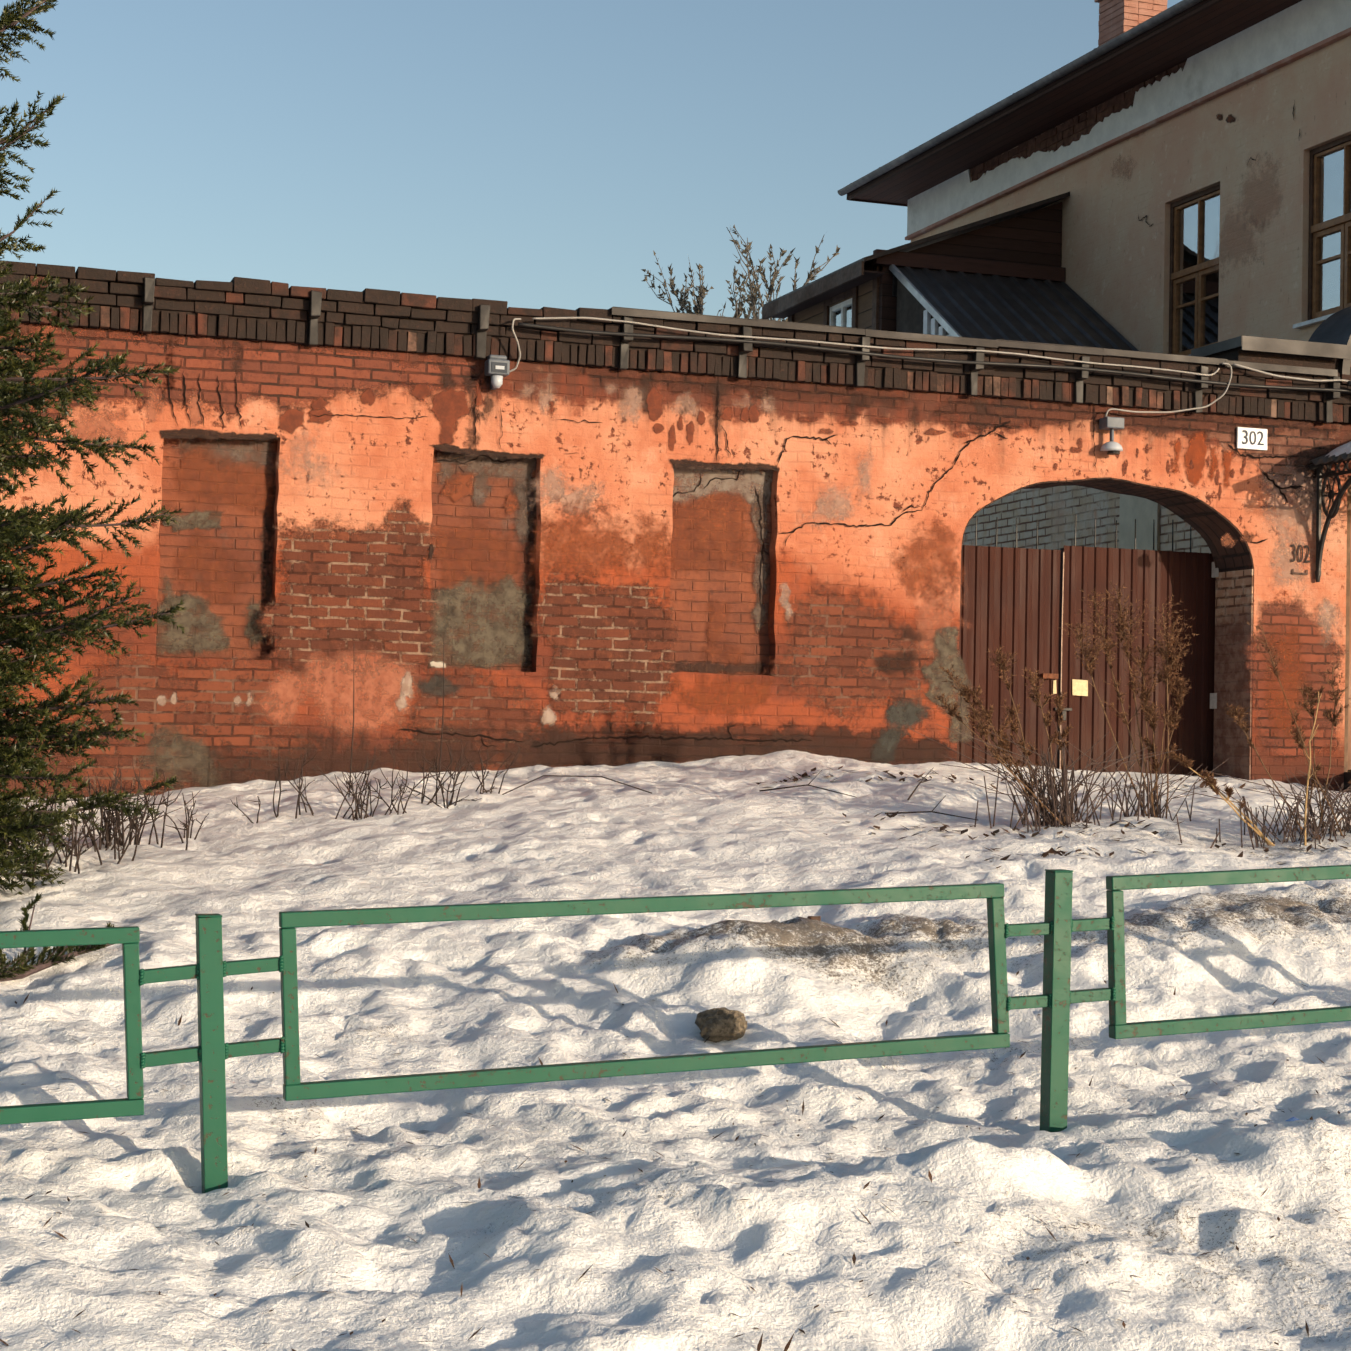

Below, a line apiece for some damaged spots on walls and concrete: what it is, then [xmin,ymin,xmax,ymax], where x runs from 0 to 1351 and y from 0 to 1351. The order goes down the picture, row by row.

flaking render [970,61,1186,181]
flaking render [0,314,544,459]
crack [673,383,1014,607]
flaking render [67,484,956,796]
flaking render [1246,598,1347,760]